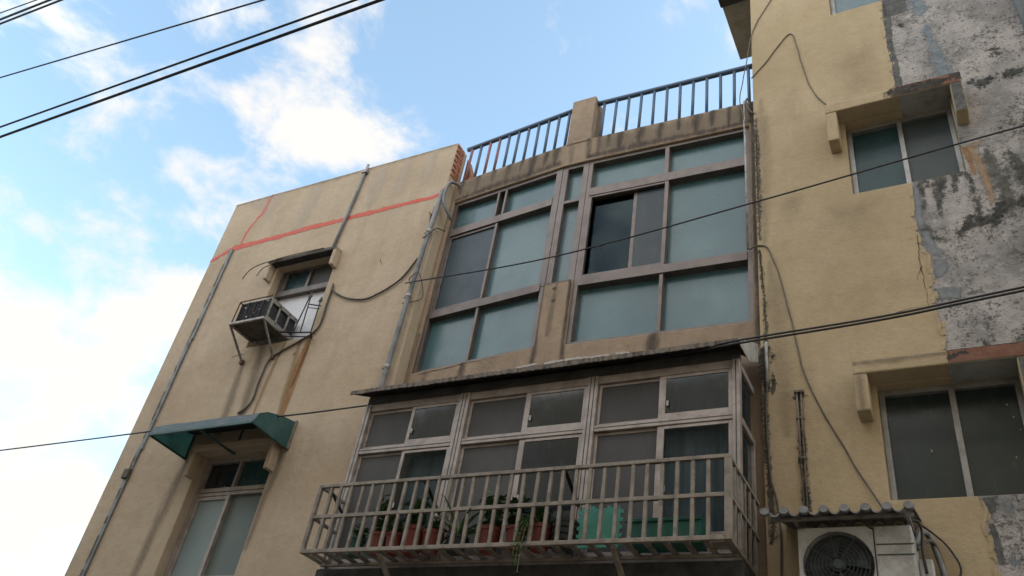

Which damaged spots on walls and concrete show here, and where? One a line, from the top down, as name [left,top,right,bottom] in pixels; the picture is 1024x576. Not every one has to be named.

peeling [878,0,1024,380]
crack [896,235,929,313]
water stain [587,102,778,545]
corrosion [254,337,311,415]
peeling [978,494,1024,576]